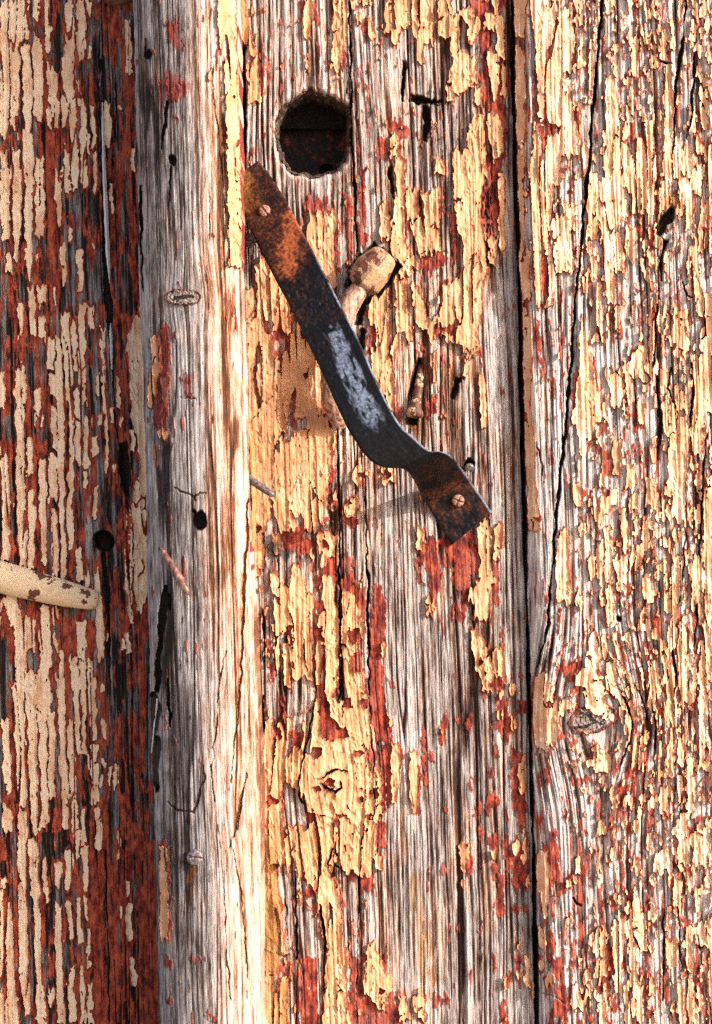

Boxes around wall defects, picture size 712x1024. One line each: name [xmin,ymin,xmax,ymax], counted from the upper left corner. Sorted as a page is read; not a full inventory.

peeling [0,0,169,1024]
crack [150,430,371,983]
peeling [290,0,314,39]
peeling [307,200,349,299]
peeling [245,255,419,1024]
peeling [330,0,712,1024]
crack [538,0,603,665]